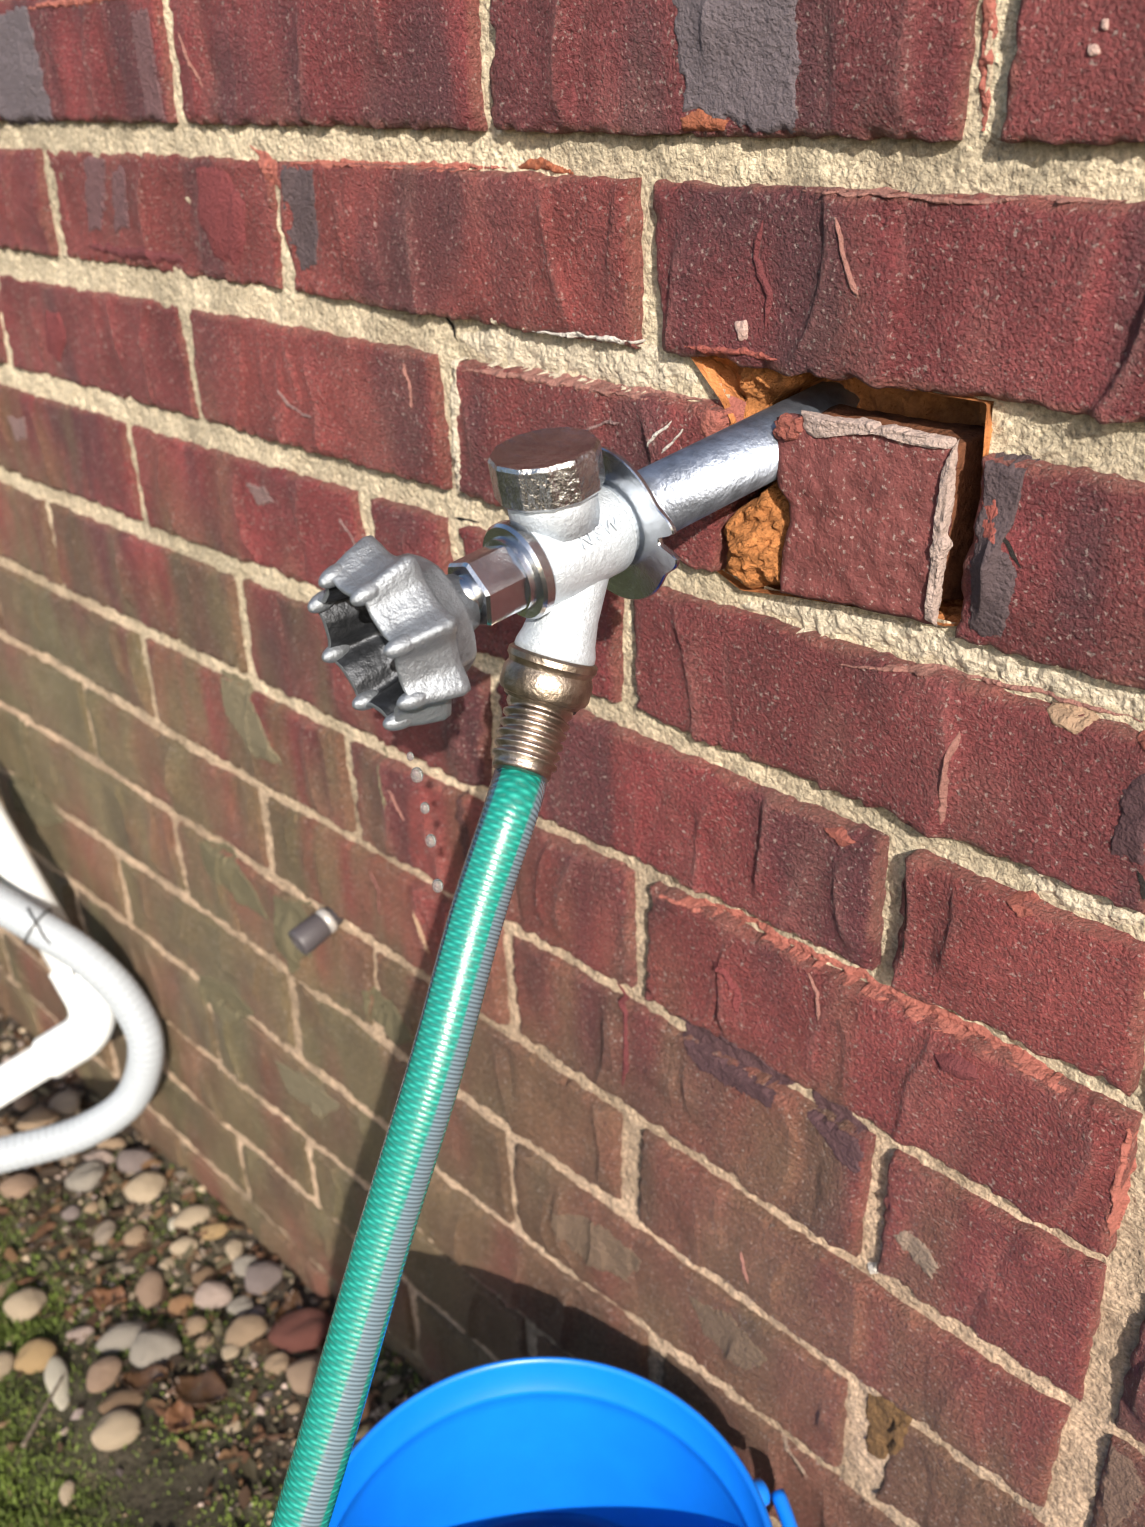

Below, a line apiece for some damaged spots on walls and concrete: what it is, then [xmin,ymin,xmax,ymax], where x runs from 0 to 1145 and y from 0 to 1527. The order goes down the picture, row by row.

spalling [724,481,790,589]
spalling [982,499,998,544]